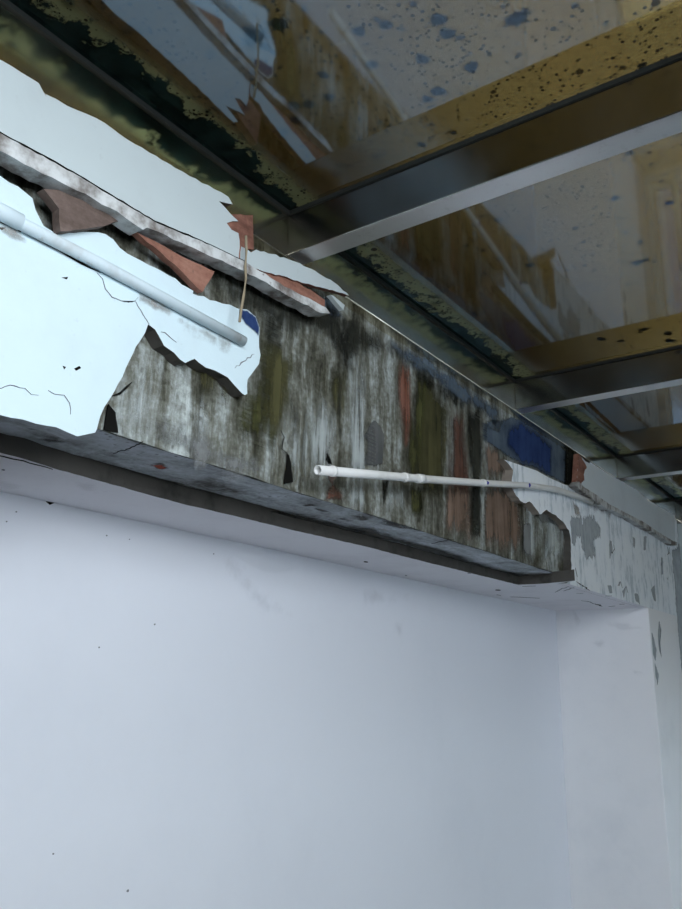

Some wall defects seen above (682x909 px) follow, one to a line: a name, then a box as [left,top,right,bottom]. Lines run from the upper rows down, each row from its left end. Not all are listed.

crack [33,237,176,342]
peeling [242,310,259,334]
water stain [212,274,392,370]
crack [0,385,71,414]
spalling [103,404,118,433]
spalling [284,454,293,484]
water stain [292,410,329,465]
water stain [351,392,384,469]
water stain [409,369,563,557]
peeling [483,417,566,483]
water stain [274,504,528,576]
peeling [570,514,600,560]